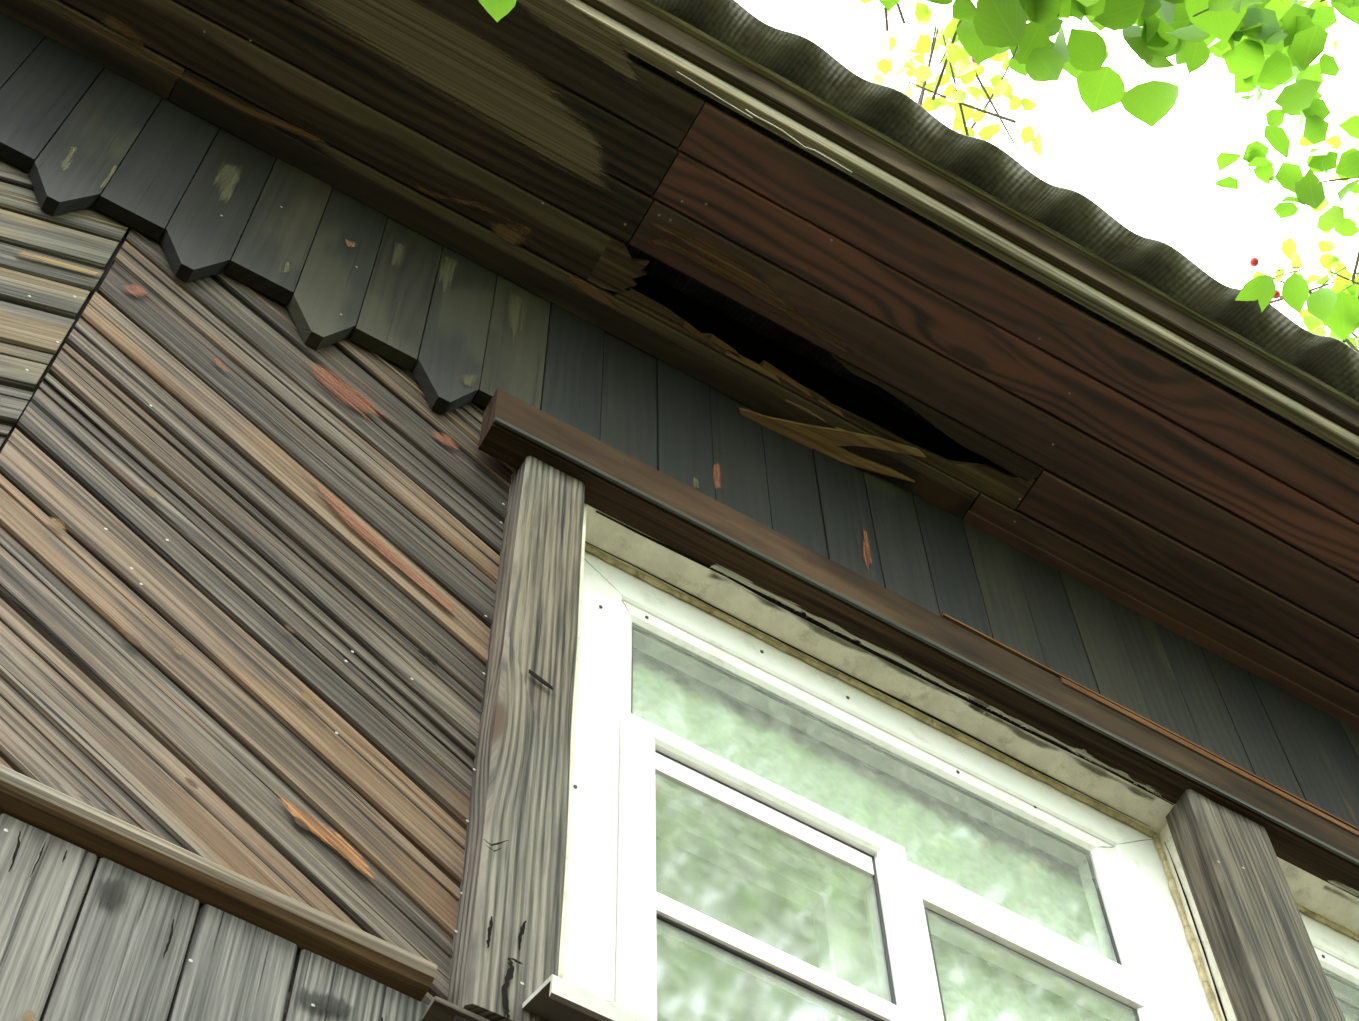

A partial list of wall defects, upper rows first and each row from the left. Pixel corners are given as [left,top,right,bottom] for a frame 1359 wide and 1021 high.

peeling [1328,880,1359,896]